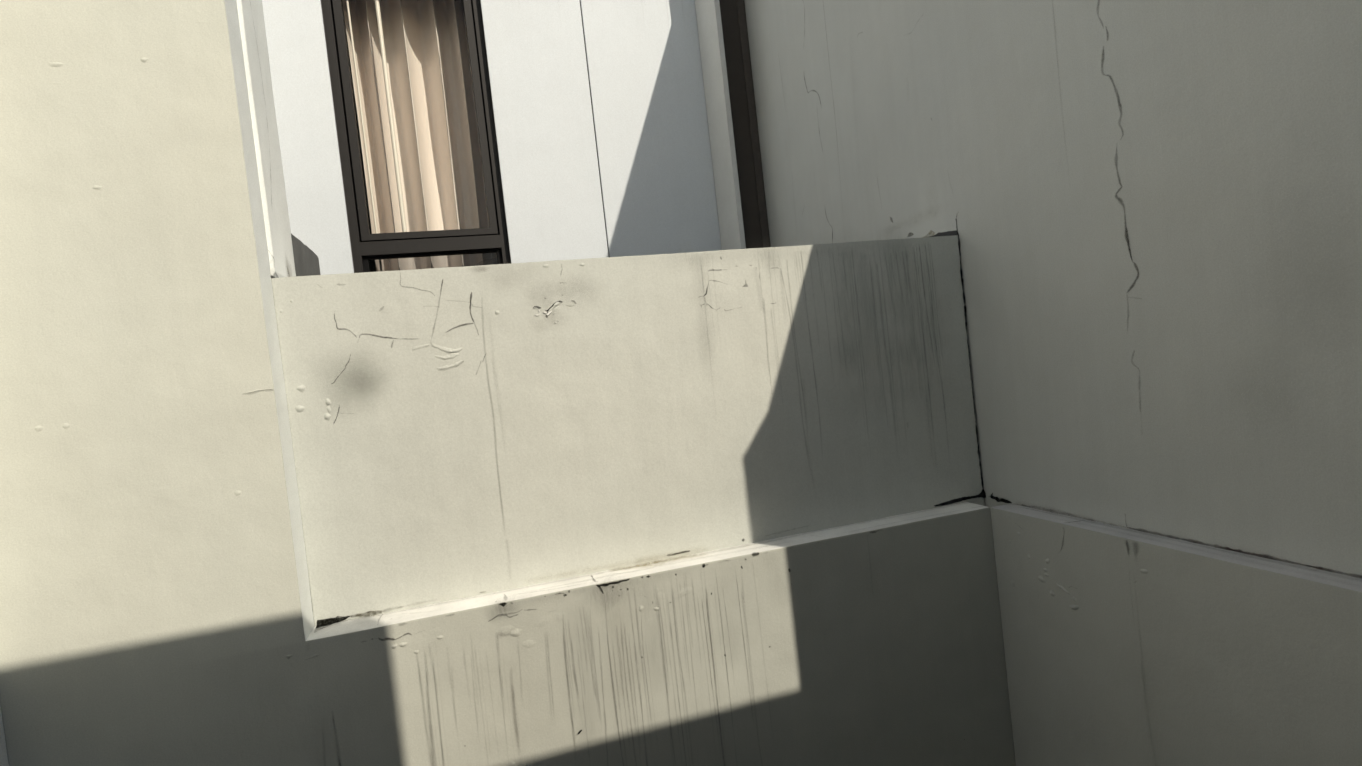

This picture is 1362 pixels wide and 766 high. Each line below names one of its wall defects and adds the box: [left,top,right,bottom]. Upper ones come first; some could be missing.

crack [441,280,474,331]
water stain [316,611,381,628]